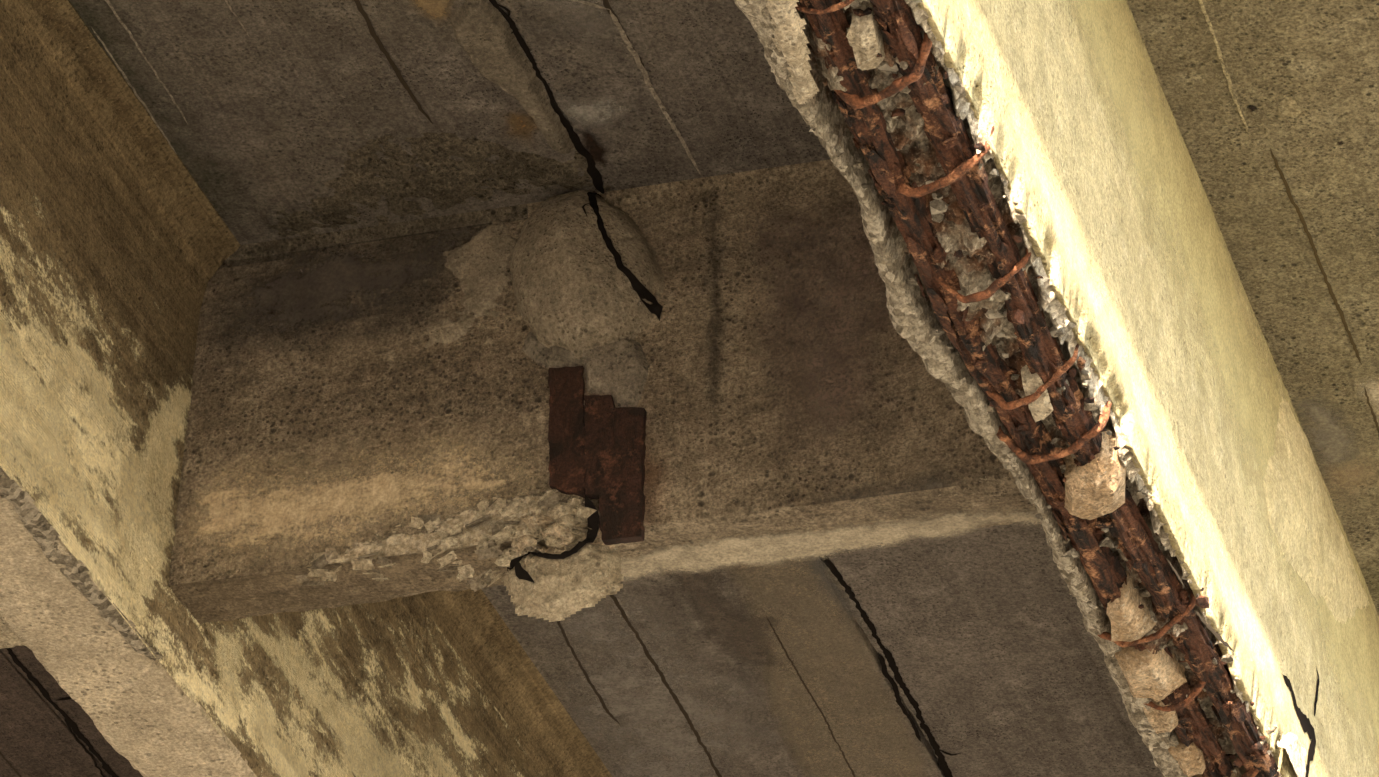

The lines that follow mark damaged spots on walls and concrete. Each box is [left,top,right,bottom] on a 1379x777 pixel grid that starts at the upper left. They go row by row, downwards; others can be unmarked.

crack [489,0,663,321]
crack [569,0,700,174]
crack [1198,0,1379,433]
spalling [734,0,1307,777]
crack [6,648,119,777]
peeling [295,489,591,592]
crack [766,616,856,777]
crack [819,555,960,777]
crack [1167,559,1233,651]
crack [1283,667,1320,777]